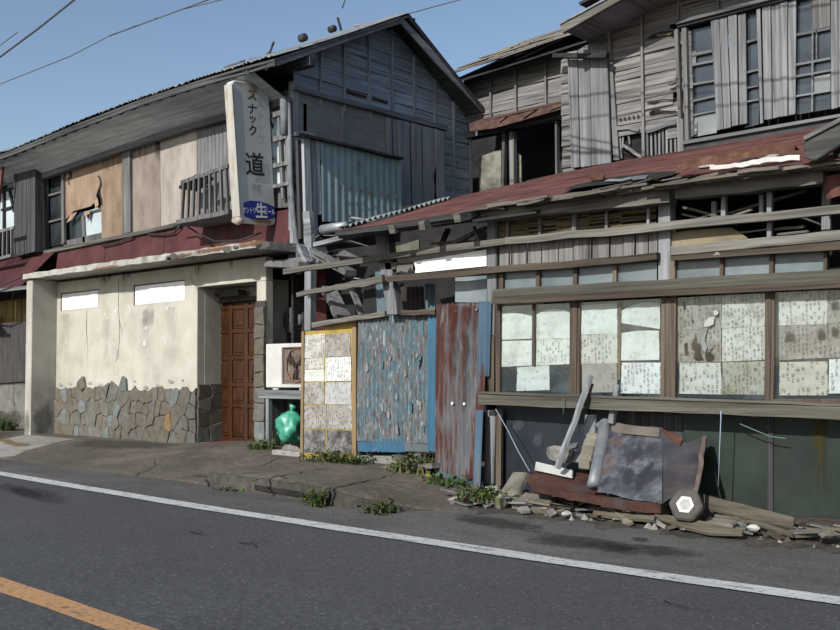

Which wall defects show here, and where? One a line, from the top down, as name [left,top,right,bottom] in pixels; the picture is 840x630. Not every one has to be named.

corrosion [675,145,801,174]
peeling [67,199,99,222]
corrosion [177,240,264,258]
corrosion [449,305,476,400]